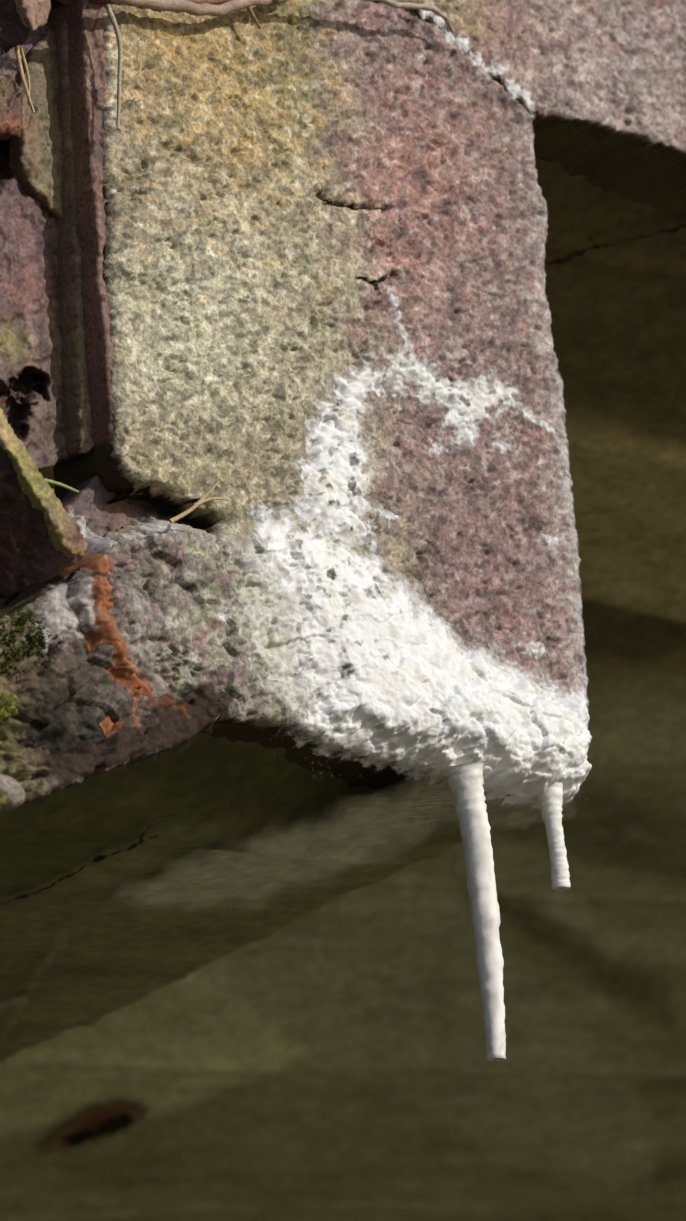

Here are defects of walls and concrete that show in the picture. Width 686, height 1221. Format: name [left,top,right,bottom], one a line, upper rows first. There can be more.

crack [320,188,384,210]
crack [355,274,399,295]
damp [119,287,592,908]
corrosion [65,551,190,738]
crack [0,814,171,905]
spalling [38,1100,149,1153]